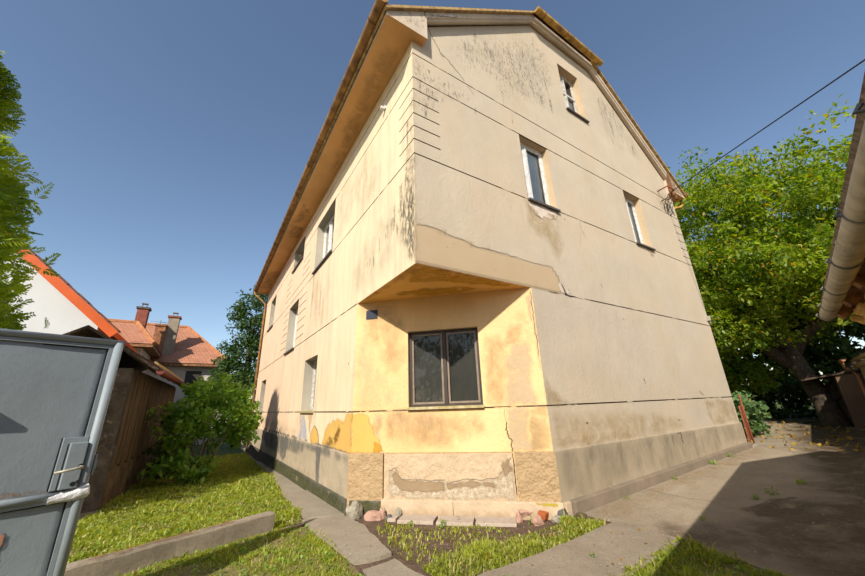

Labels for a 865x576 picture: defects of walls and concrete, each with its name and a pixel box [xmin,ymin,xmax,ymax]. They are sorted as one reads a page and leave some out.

flaking render [529,201,565,219]
damp [264,420,342,482]
spalling [389,458,515,501]
crack [504,411,517,492]